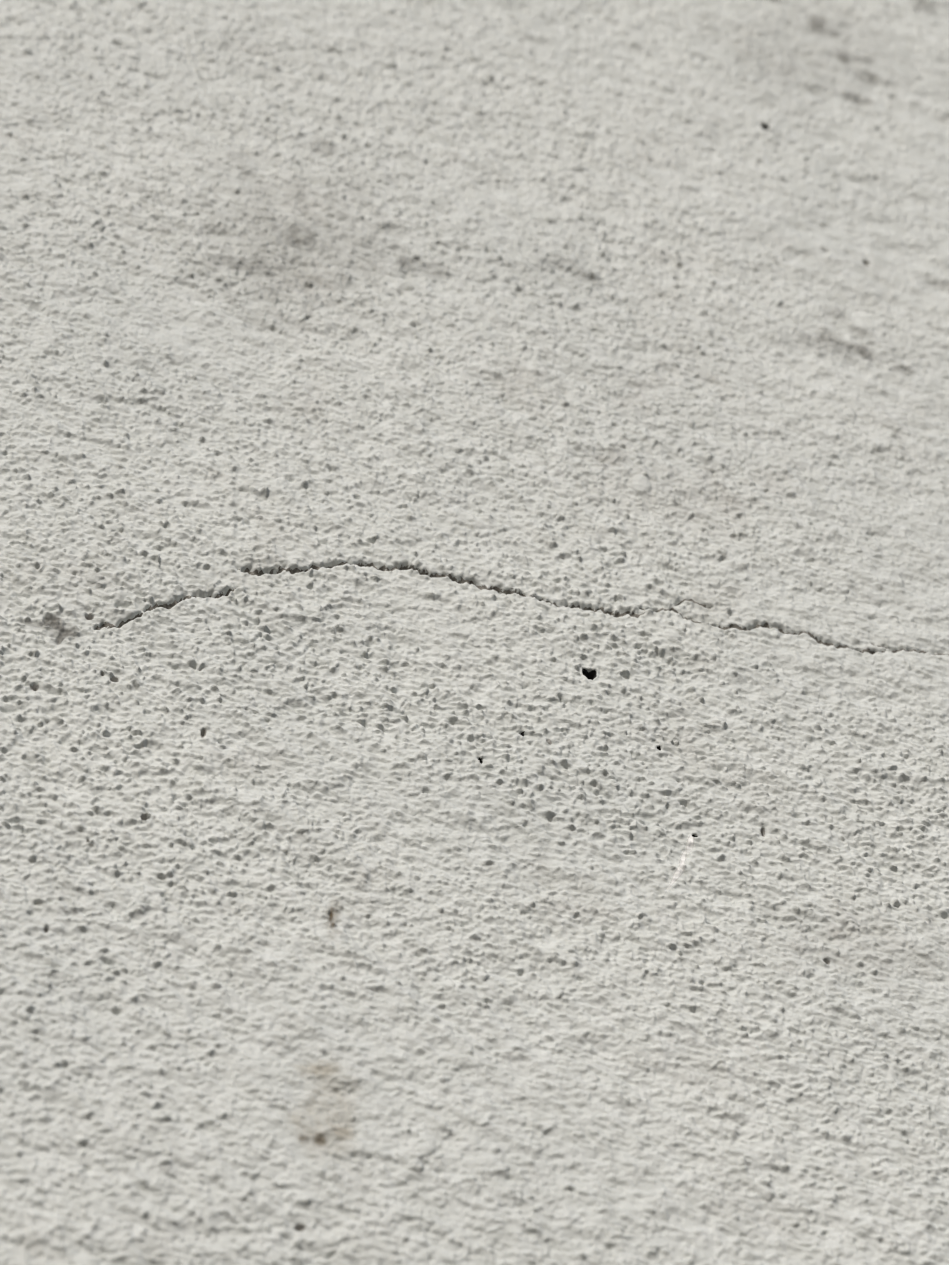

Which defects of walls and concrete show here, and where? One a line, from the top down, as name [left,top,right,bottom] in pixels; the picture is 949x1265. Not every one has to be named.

crack [96,562,949,655]